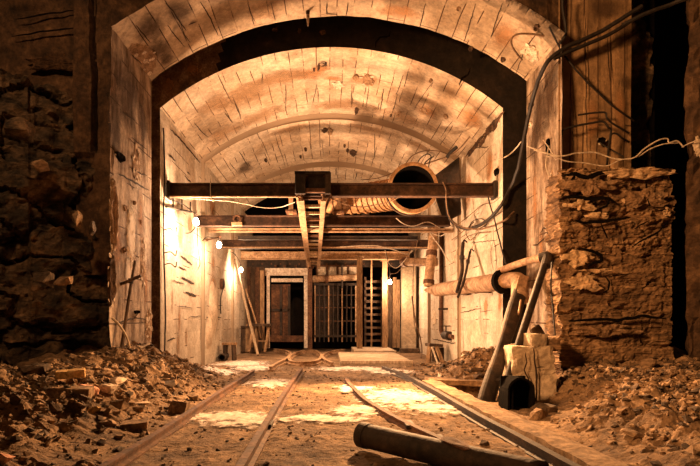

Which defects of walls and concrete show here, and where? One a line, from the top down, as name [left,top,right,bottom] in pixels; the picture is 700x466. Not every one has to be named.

spalling [510,33,544,62]
spalling [352,73,375,86]
spalling [465,111,504,158]
spalling [550,256,565,336]
spalling [573,323,643,338]